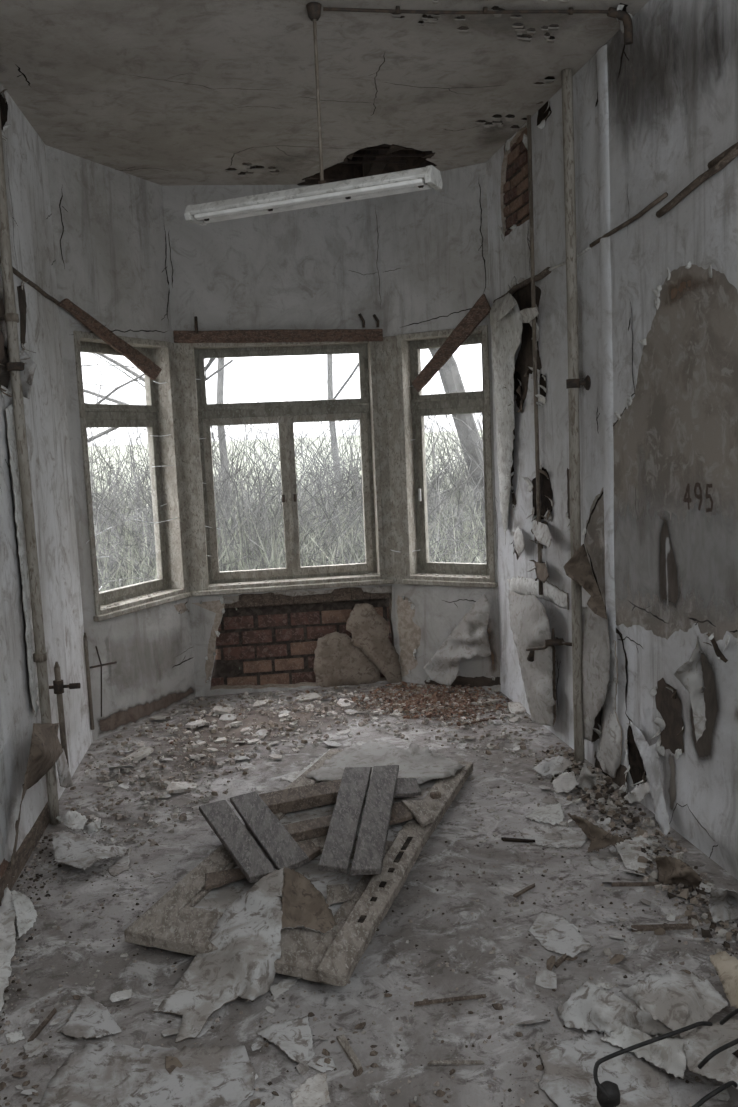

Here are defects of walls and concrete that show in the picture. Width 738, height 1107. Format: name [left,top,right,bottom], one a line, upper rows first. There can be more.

flaking render [476,100,552,242]
peeling [565,261,738,663]
flaking render [174,586,421,708]
peeling [592,678,684,793]